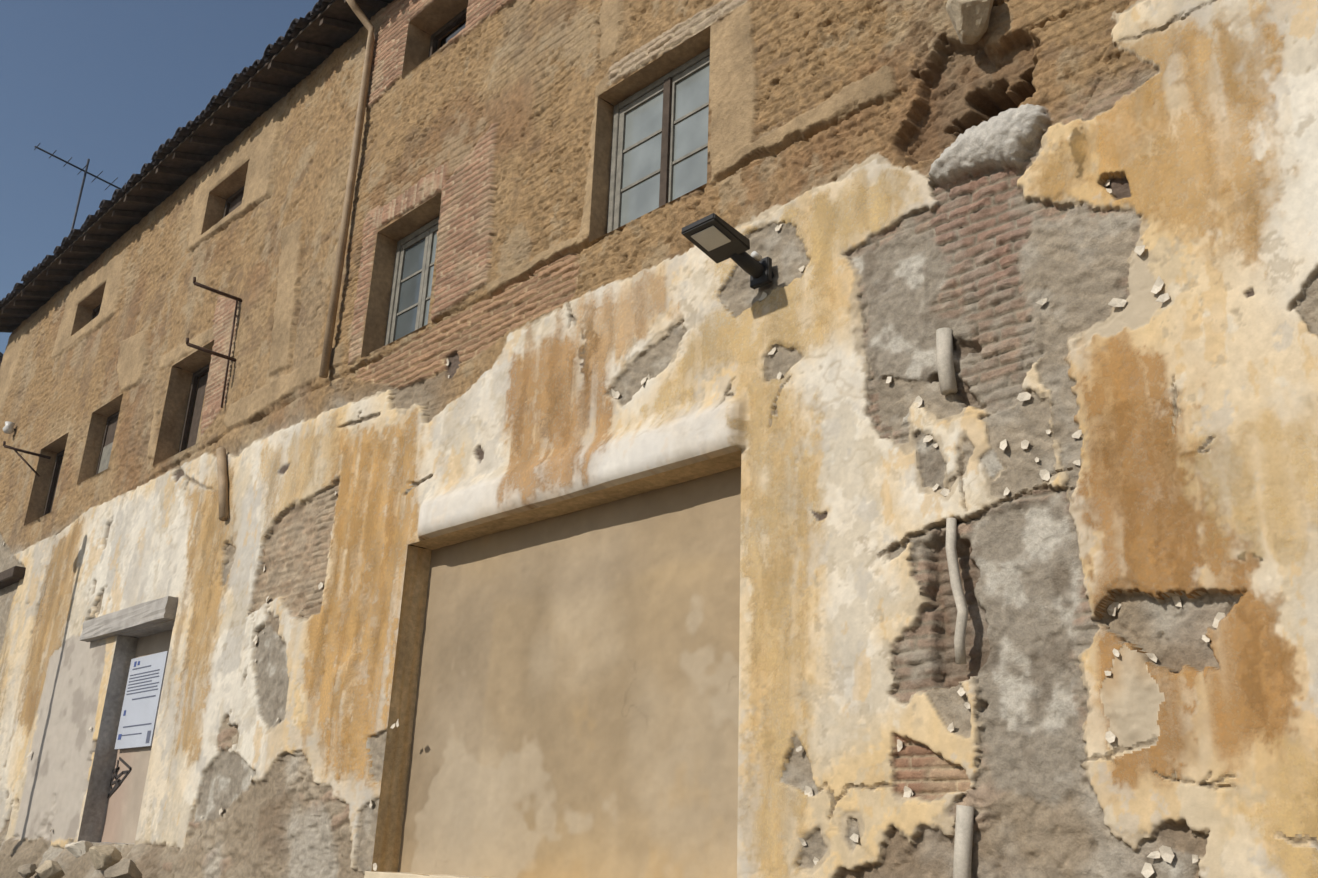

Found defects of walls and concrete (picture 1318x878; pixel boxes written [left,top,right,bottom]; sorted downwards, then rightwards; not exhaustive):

crack [1114,0,1217,47]
flaking render [1291,271,1318,337]
flaking render [845,85,1244,878]
flaking render [247,478,340,620]
damp [18,521,83,733]
damp [262,412,425,784]
flaking render [252,624,289,729]
flaking render [194,750,256,823]
flaking render [366,719,399,783]
flaking render [780,735,818,797]
flaking render [353,799,379,873]
crack [1274,831,1318,850]